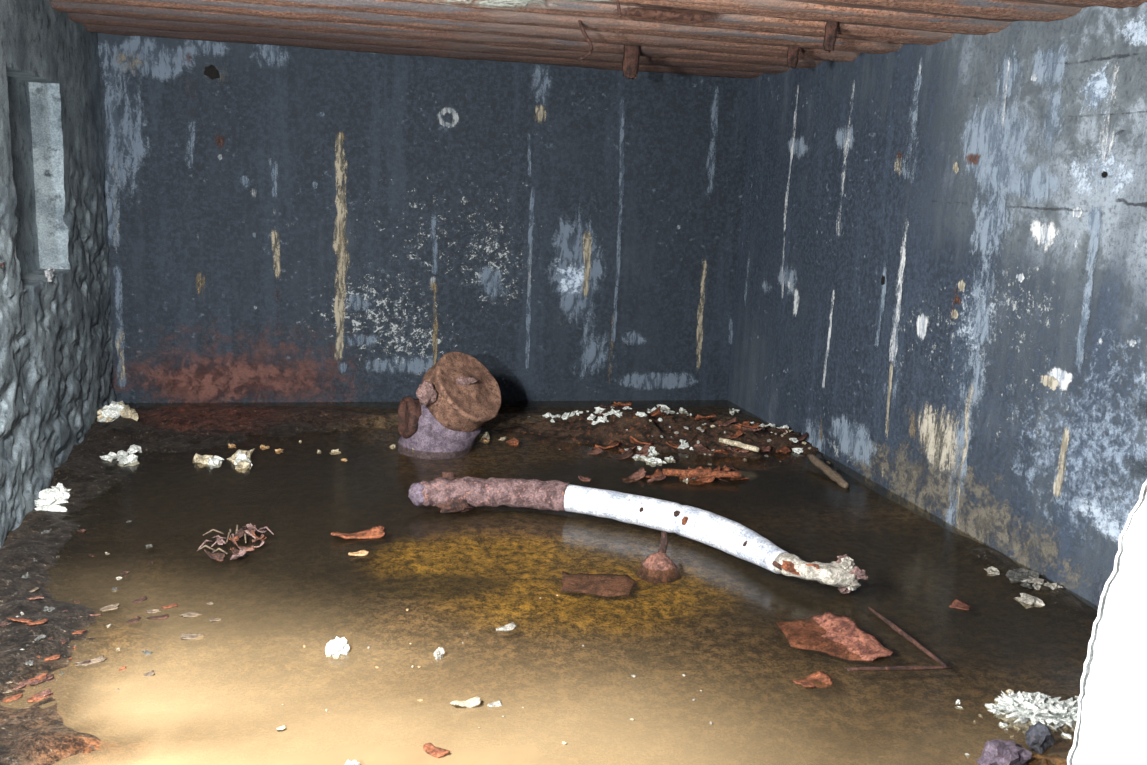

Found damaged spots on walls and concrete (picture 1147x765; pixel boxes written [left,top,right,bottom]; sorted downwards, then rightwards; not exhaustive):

damp [250,44,288,66]
damp [425,0,612,10]
corrosion [607,6,724,24]
damp [1119,14,1147,46]
damp [532,66,551,122]
damp [706,87,719,193]
crack [1117,199,1147,208]
damp [318,132,535,374]
damp [549,99,645,377]
damp [615,261,707,390]
damp [806,45,1147,588]
corrosion [145,358,317,403]